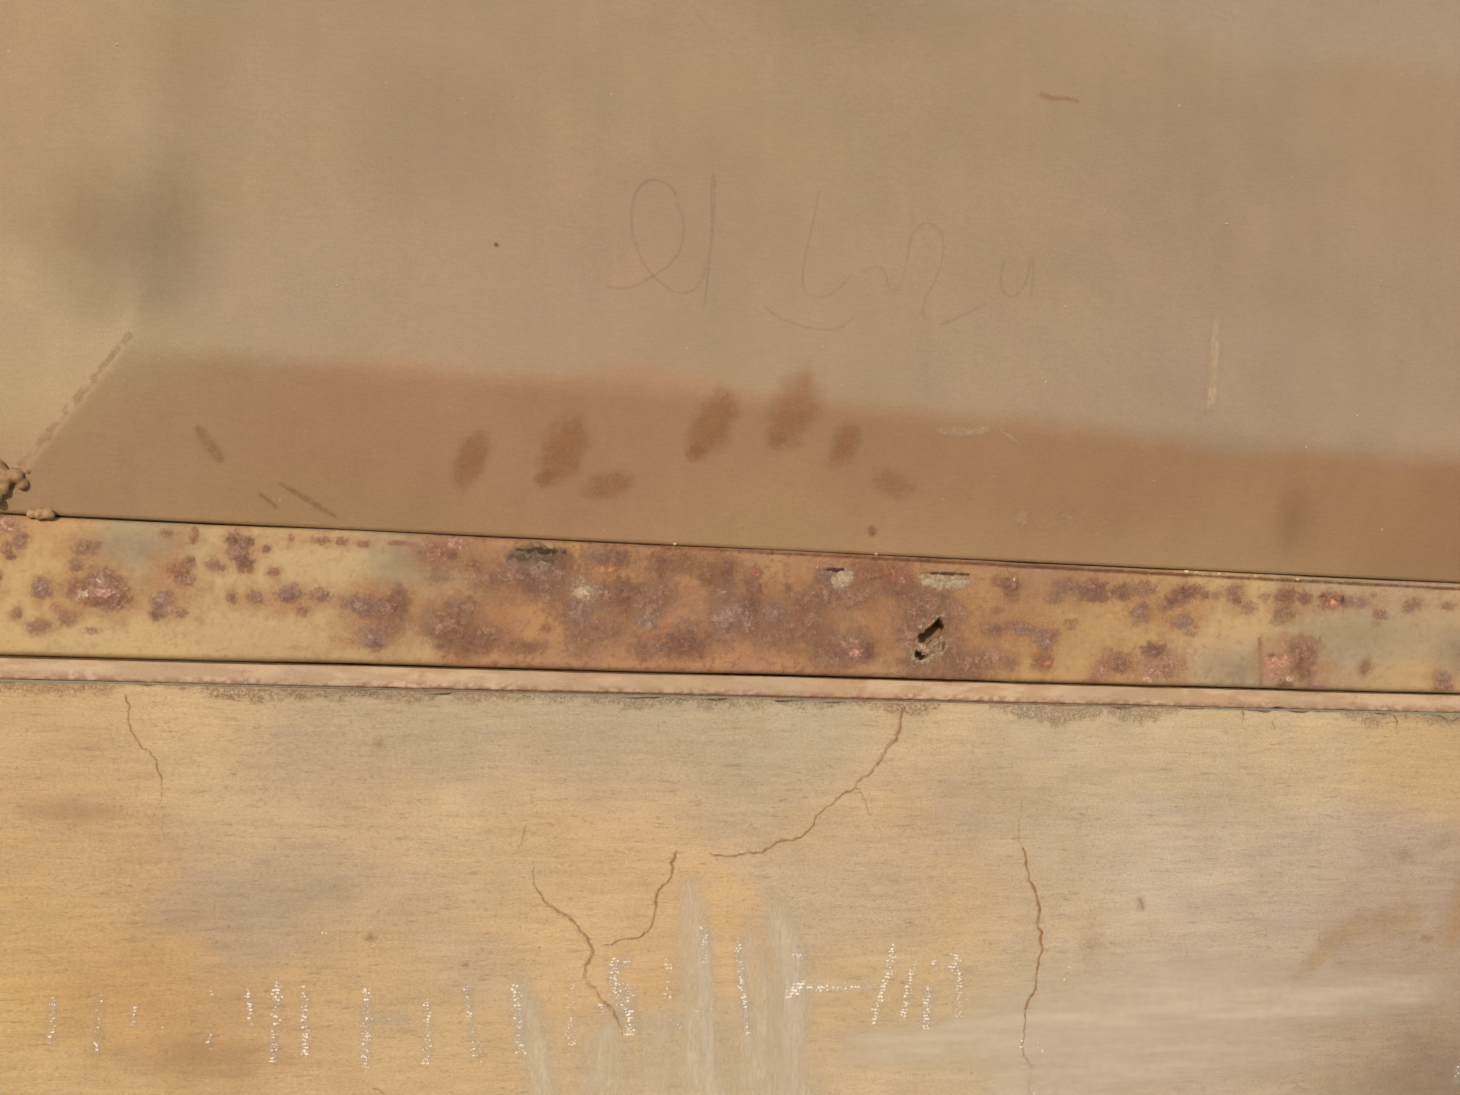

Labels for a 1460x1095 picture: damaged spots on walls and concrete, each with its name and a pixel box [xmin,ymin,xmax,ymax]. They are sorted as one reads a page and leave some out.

corrosion [0,517,28,559]
corrosion [14,543,133,633]
corrosion [148,528,329,620]
corrosion [544,549,627,657]
corrosion [709,552,1460,687]
crack [714,707,905,857]
crack [533,852,677,966]
leakage [682,891,724,1095]
leakage [739,912,809,1095]
crack [1022,848,1043,1089]